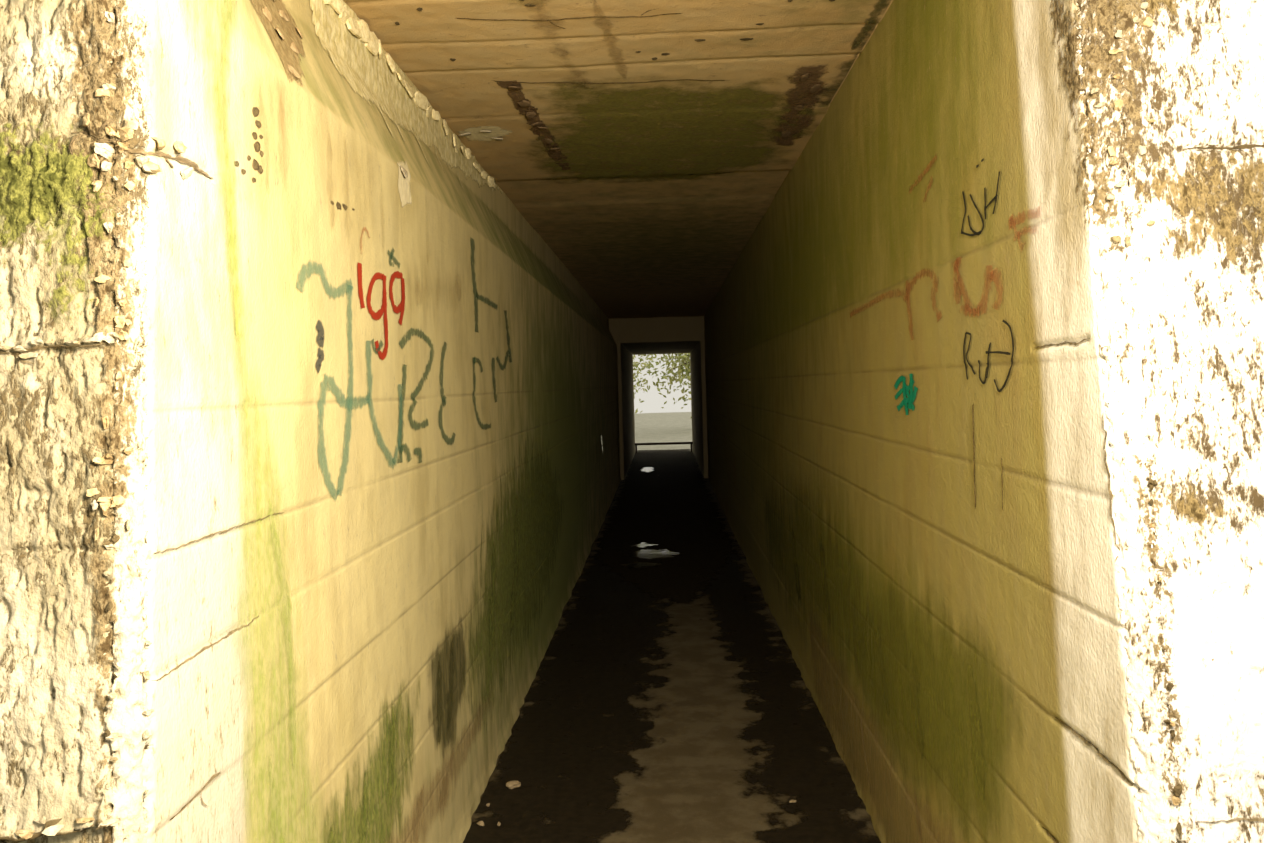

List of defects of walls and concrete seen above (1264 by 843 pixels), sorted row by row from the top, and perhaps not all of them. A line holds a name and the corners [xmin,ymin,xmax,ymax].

spalling [497,81,571,170]
spalling [772,65,826,146]
spalling [1050,0,1156,249]
crack [1183,143,1264,151]
crack [0,337,106,364]
damp [463,449,881,843]
damp [431,632,479,775]
crack [0,816,95,843]